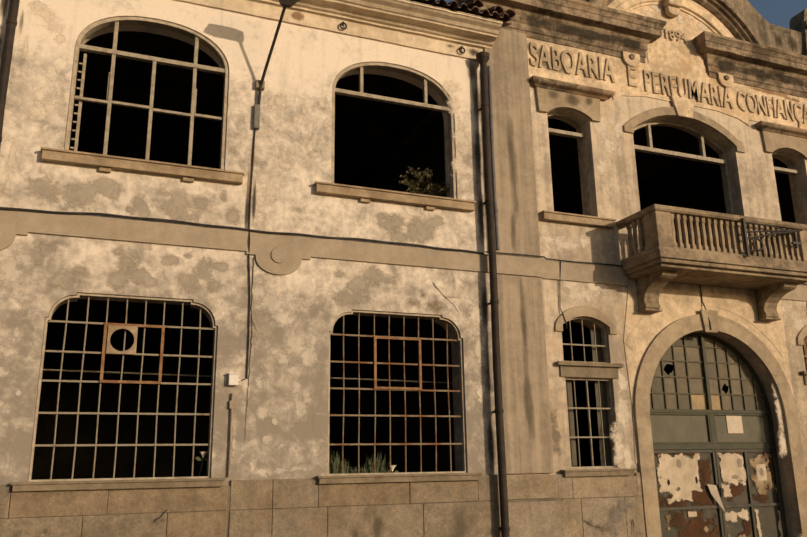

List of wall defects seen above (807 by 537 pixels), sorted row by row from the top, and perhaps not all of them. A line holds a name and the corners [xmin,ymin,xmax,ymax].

damp [470,50,480,116]
peeling [611,370,633,469]
peeling [772,383,788,454]